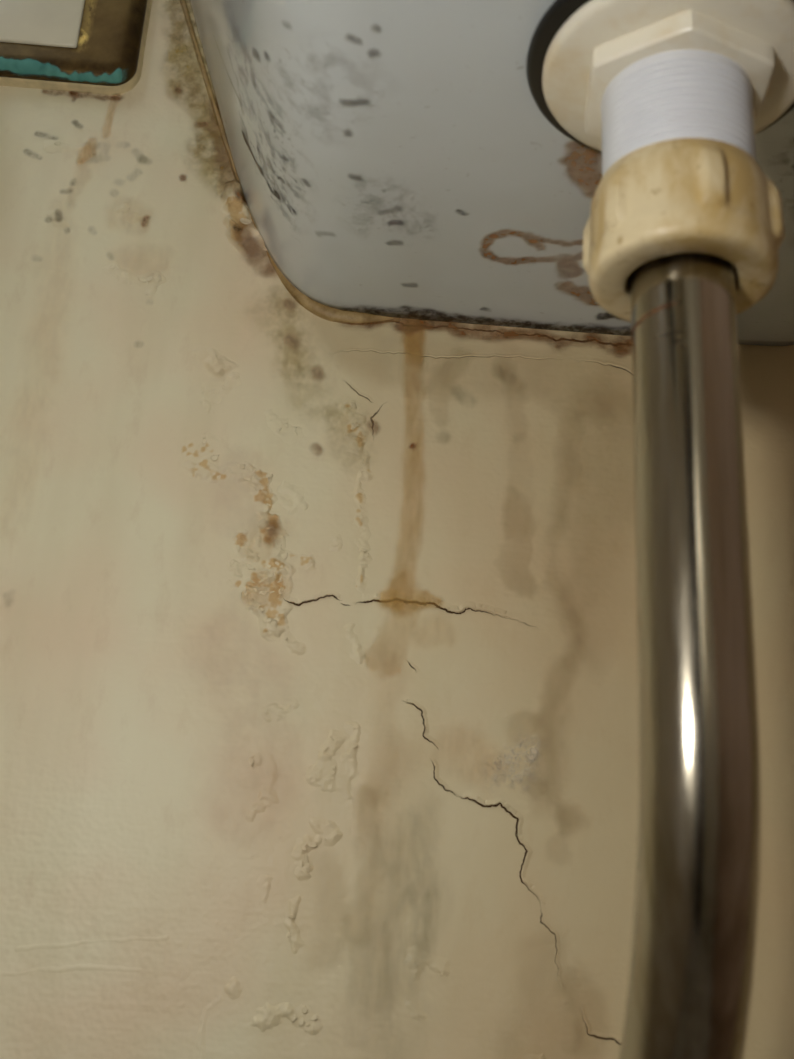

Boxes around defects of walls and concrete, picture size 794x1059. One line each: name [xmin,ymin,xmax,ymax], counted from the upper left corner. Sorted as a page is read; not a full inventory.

leakage [169,0,245,202]
rust [563,142,602,195]
rust [482,230,583,264]
rust [559,283,598,305]
peeling [226,468,317,642]
crack [284,590,525,621]
crack [403,697,565,987]
peeling [249,1002,324,1035]
crack [581,1007,622,1045]